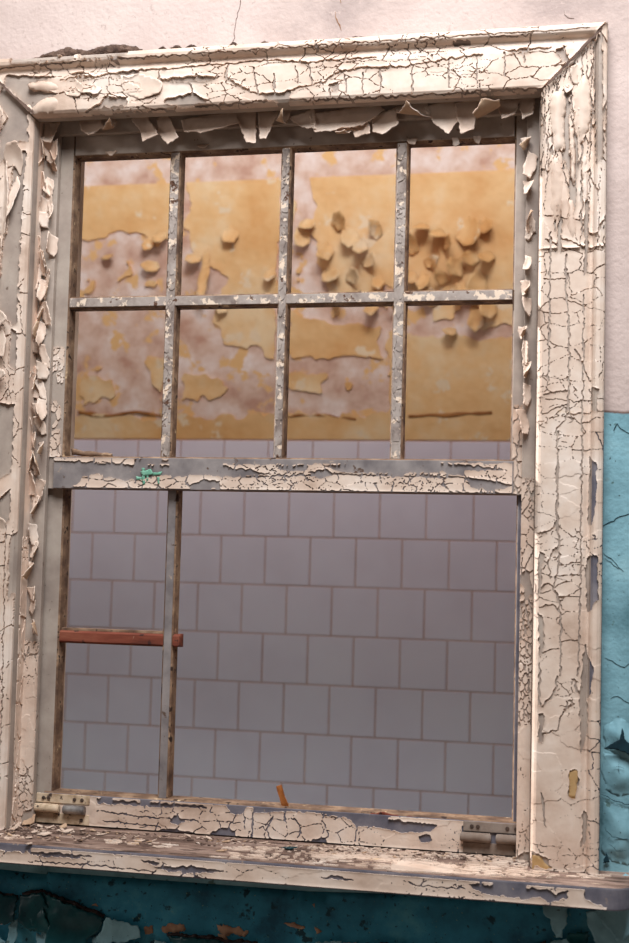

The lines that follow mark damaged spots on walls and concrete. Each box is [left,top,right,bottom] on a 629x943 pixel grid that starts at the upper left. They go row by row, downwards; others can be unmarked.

peeling [0,21,608,250]
peeling [0,114,39,830]
peeling [28,138,611,879]
peeling [0,830,38,840]
peeling [0,848,629,943]